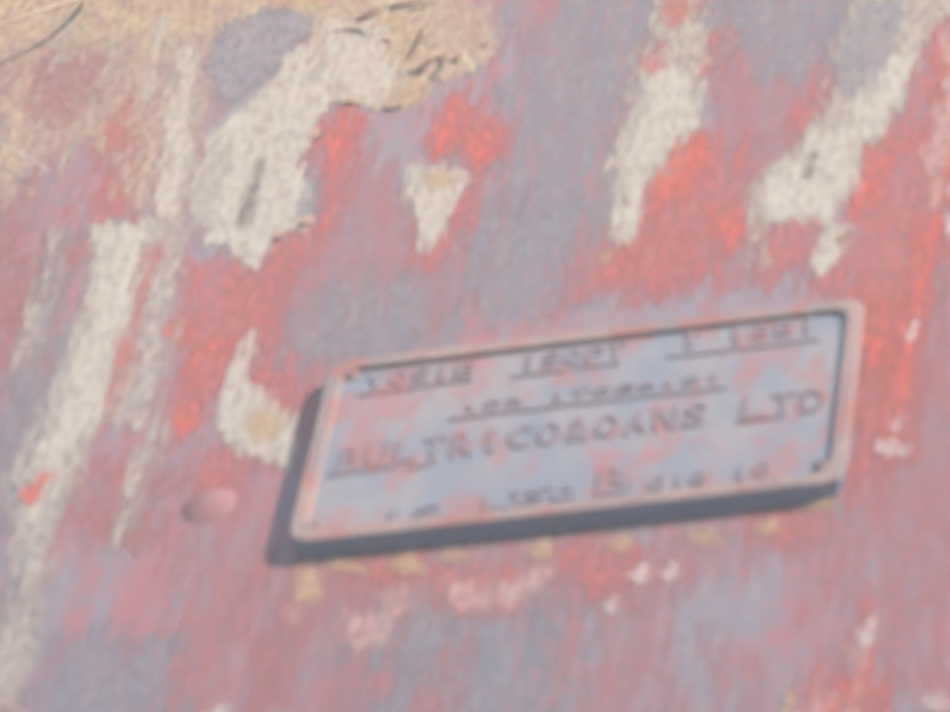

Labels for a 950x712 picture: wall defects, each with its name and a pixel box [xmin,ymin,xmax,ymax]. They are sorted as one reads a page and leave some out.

peeling [595,0,713,263]
peeling [737,0,950,278]
peeling [0,0,505,712]